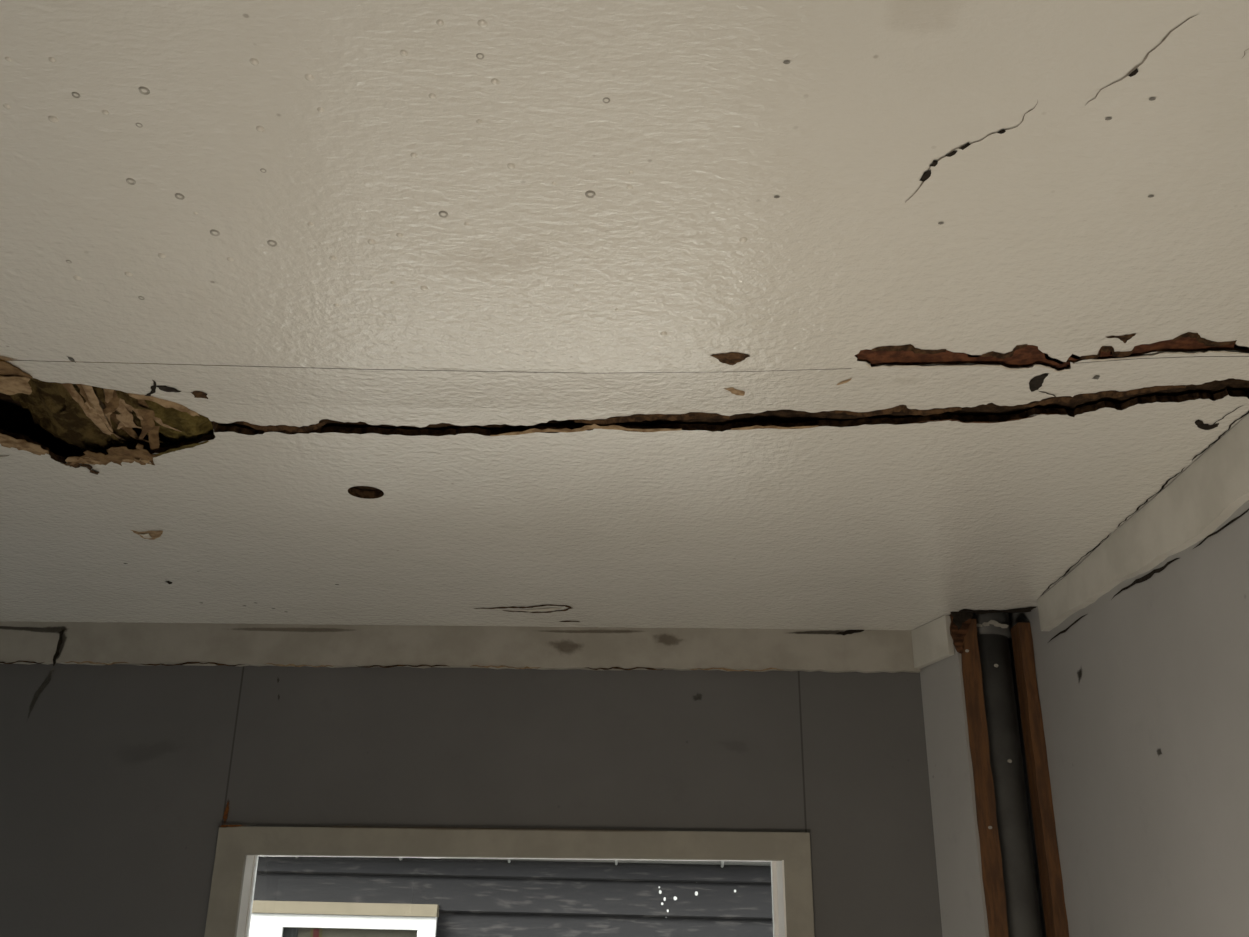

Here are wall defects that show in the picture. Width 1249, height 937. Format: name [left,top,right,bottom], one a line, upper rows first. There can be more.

crack [1088,15,1196,102]
crack [905,101,1038,203]
peeling [145,381,208,399]
crack [211,378,1249,436]
peeling [855,332,1249,398]
peeling [1195,406,1242,430]
crack [0,630,540,718]
crack [586,665,780,673]